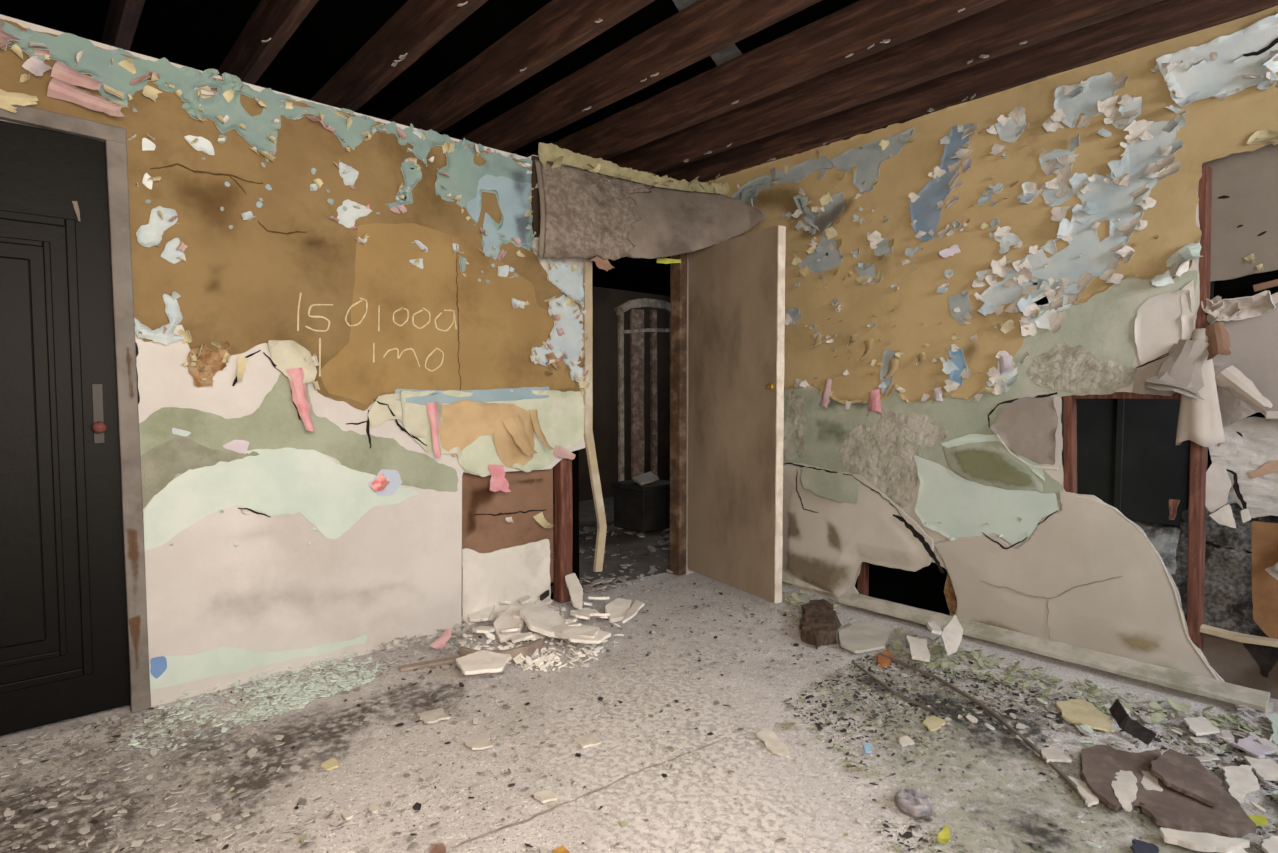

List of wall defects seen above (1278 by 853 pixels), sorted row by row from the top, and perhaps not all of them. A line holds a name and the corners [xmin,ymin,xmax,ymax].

crack [150,163,263,194]
crack [258,221,307,235]
peeling [0,13,1278,552]
spalling [855,562,950,616]